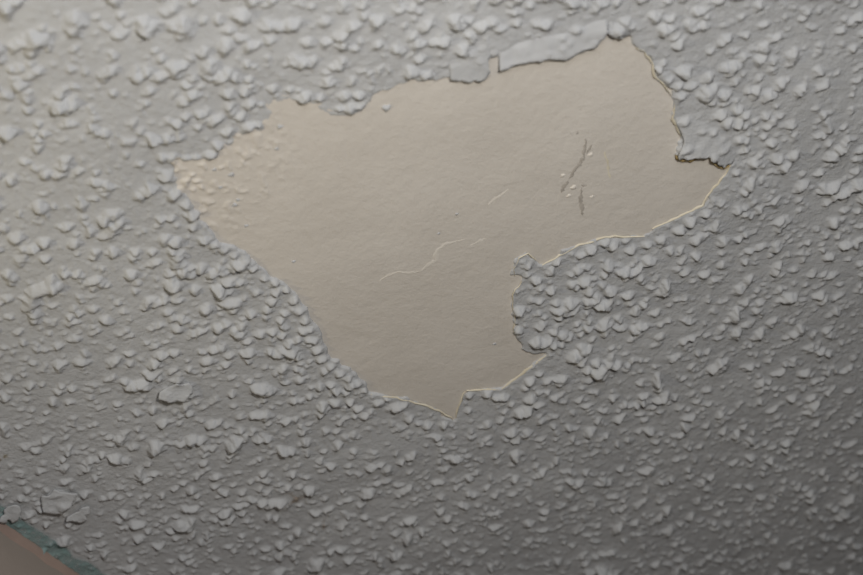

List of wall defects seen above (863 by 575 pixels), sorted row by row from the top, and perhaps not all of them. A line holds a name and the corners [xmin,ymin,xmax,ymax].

peeling [159,383,193,403]
peeling [171,19,735,420]